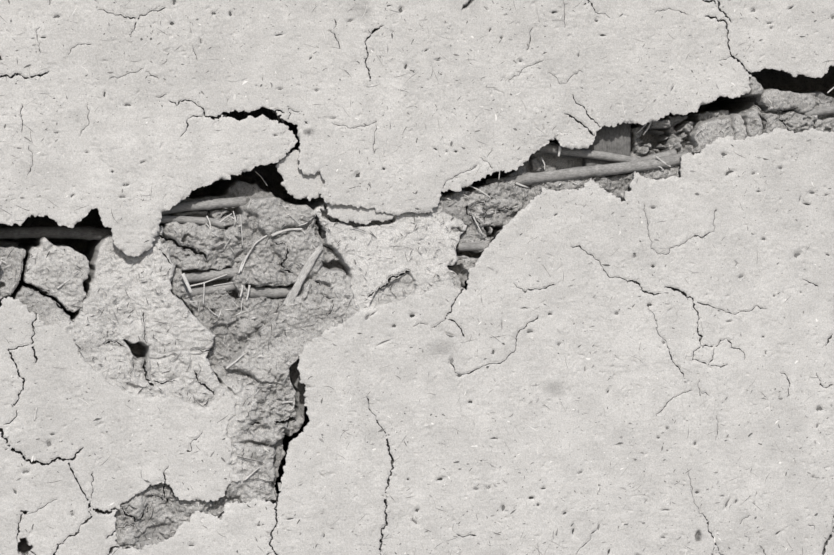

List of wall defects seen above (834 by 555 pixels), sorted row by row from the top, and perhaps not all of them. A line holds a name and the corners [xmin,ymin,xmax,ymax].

crack [0,26,51,81]
crack [91,0,167,36]
crack [654,0,799,133]
spalling [631,66,834,158]
crack [157,234,208,265]
crack [512,282,556,294]
crack [101,312,215,396]
spalling [0,138,680,551]
crack [449,314,540,377]
crack [569,244,768,441]
crack [0,247,170,555]
crack [365,397,396,555]